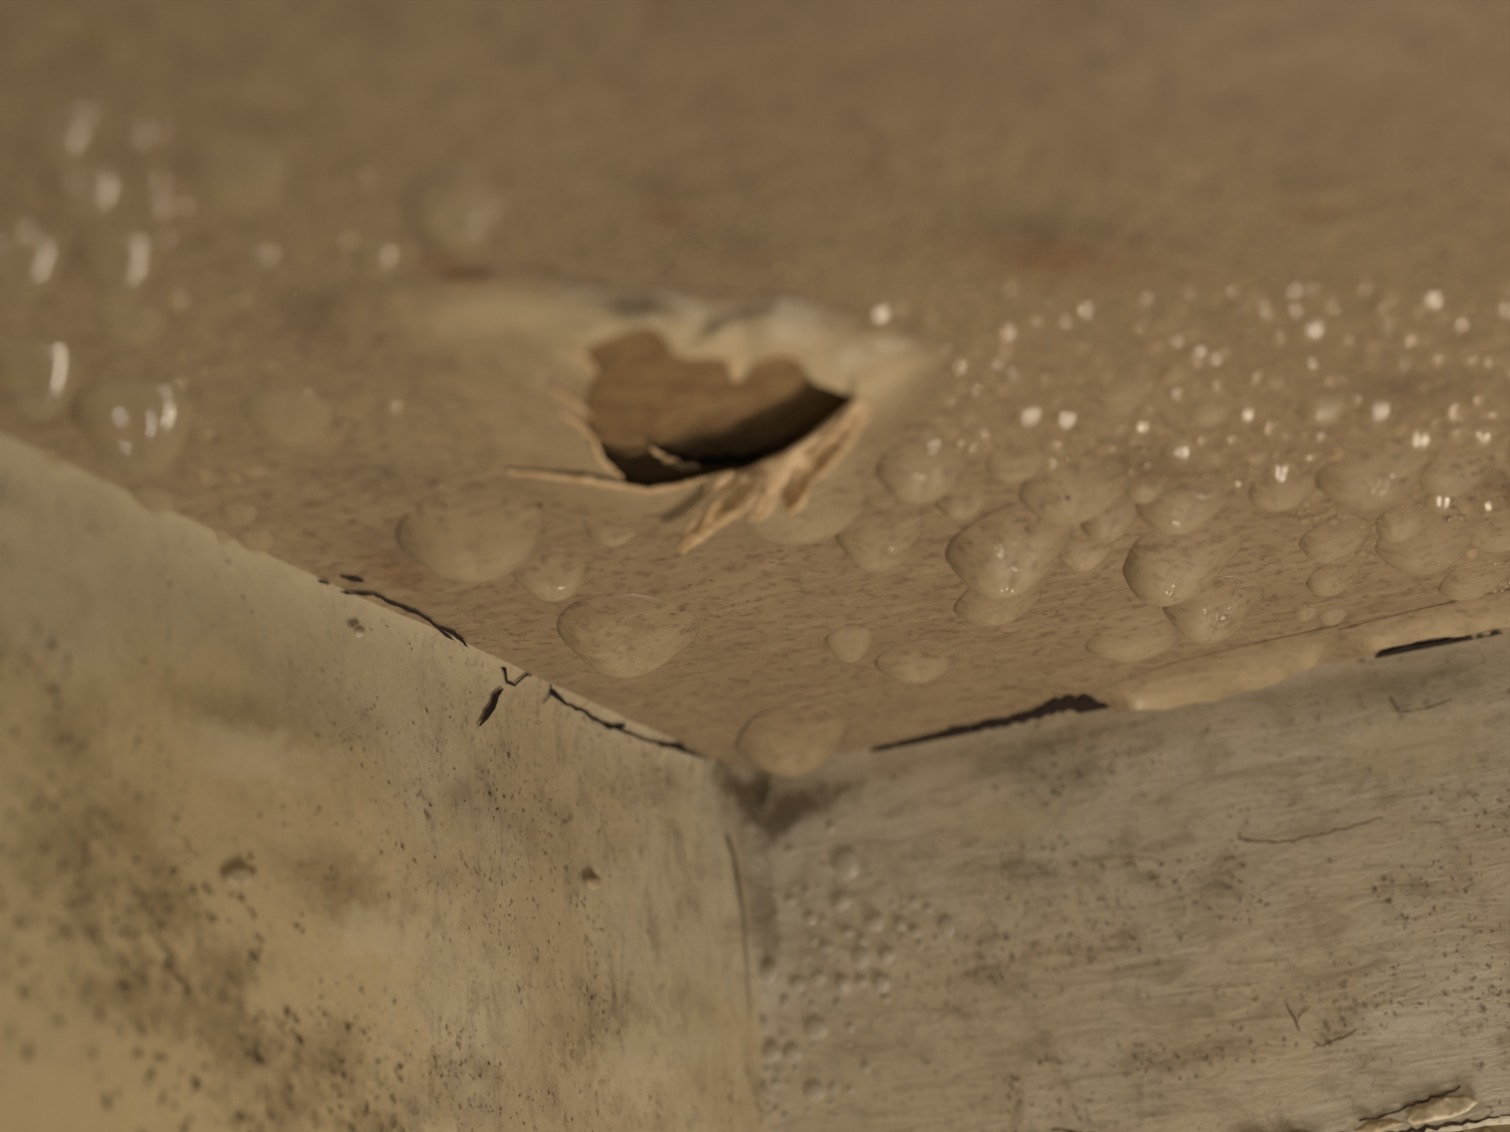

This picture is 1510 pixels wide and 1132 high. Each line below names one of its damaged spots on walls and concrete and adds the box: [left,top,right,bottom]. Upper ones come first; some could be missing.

crack [319,576,469,648]
crack [1359,633,1500,662]
crack [501,667,732,770]
crack [872,696,1109,752]
crack [1389,697,1452,721]
water stain [715,775,845,844]
crack [1238,817,1383,843]
water stain [0,696,550,1132]
water stain [983,833,1271,969]
crack [1051,1124,1076,1132]
peeling [1356,1095,1478,1132]